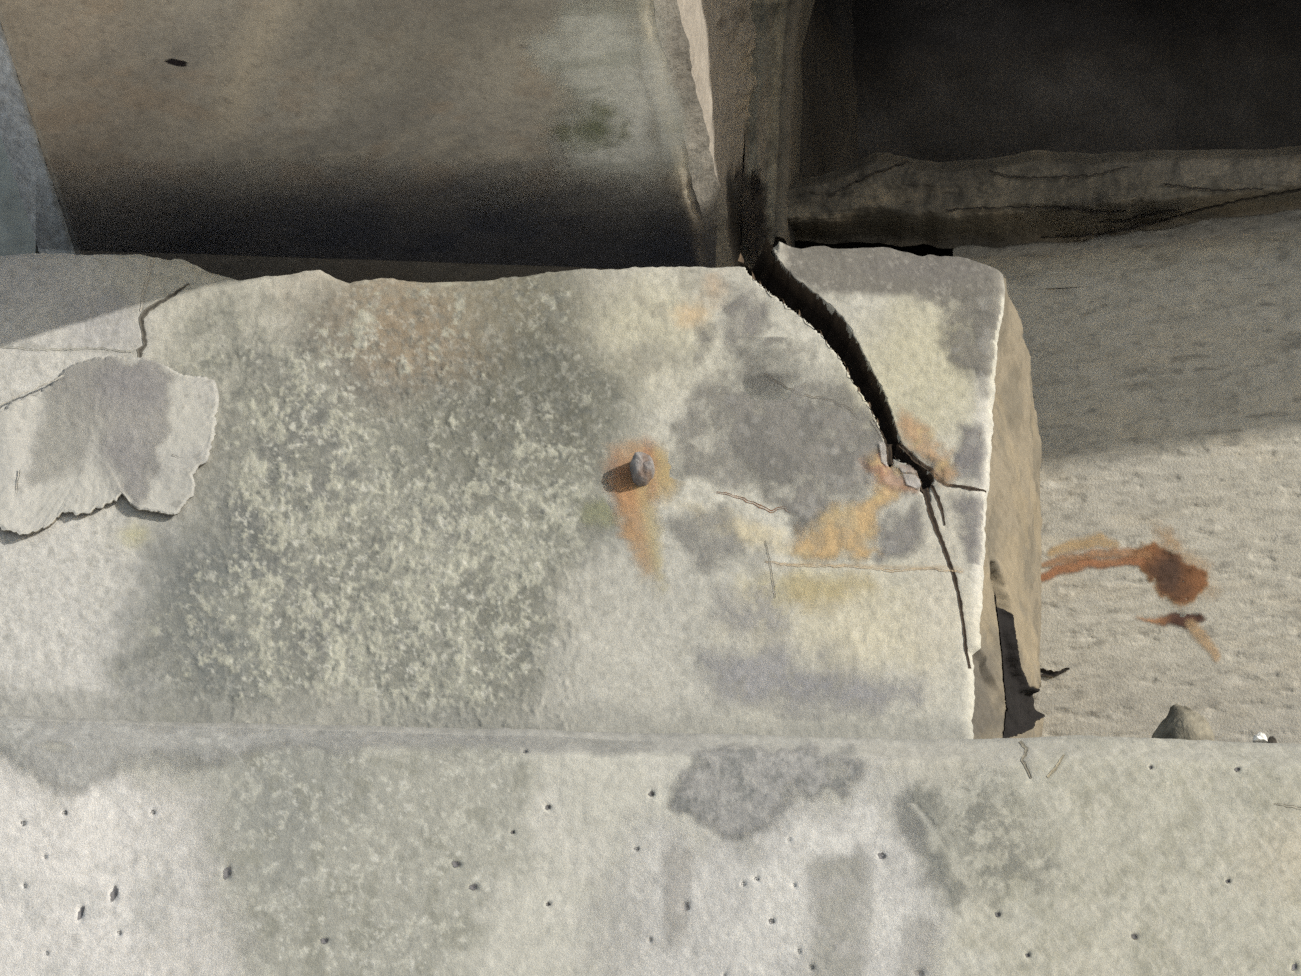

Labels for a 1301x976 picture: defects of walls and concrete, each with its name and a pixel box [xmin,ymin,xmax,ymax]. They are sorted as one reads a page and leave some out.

crack [828,160,908,196]
water stain [943,296,1000,377]
flaking render [0,356,219,536]
rust [614,446,673,562]
crack [720,492,790,513]
water stain [682,383,884,535]
rust [795,454,917,559]
crack [738,237,986,669]
rust [899,416,955,482]
water stain [955,427,984,479]
rust [1041,536,1219,660]
water stain [610,744,943,976]